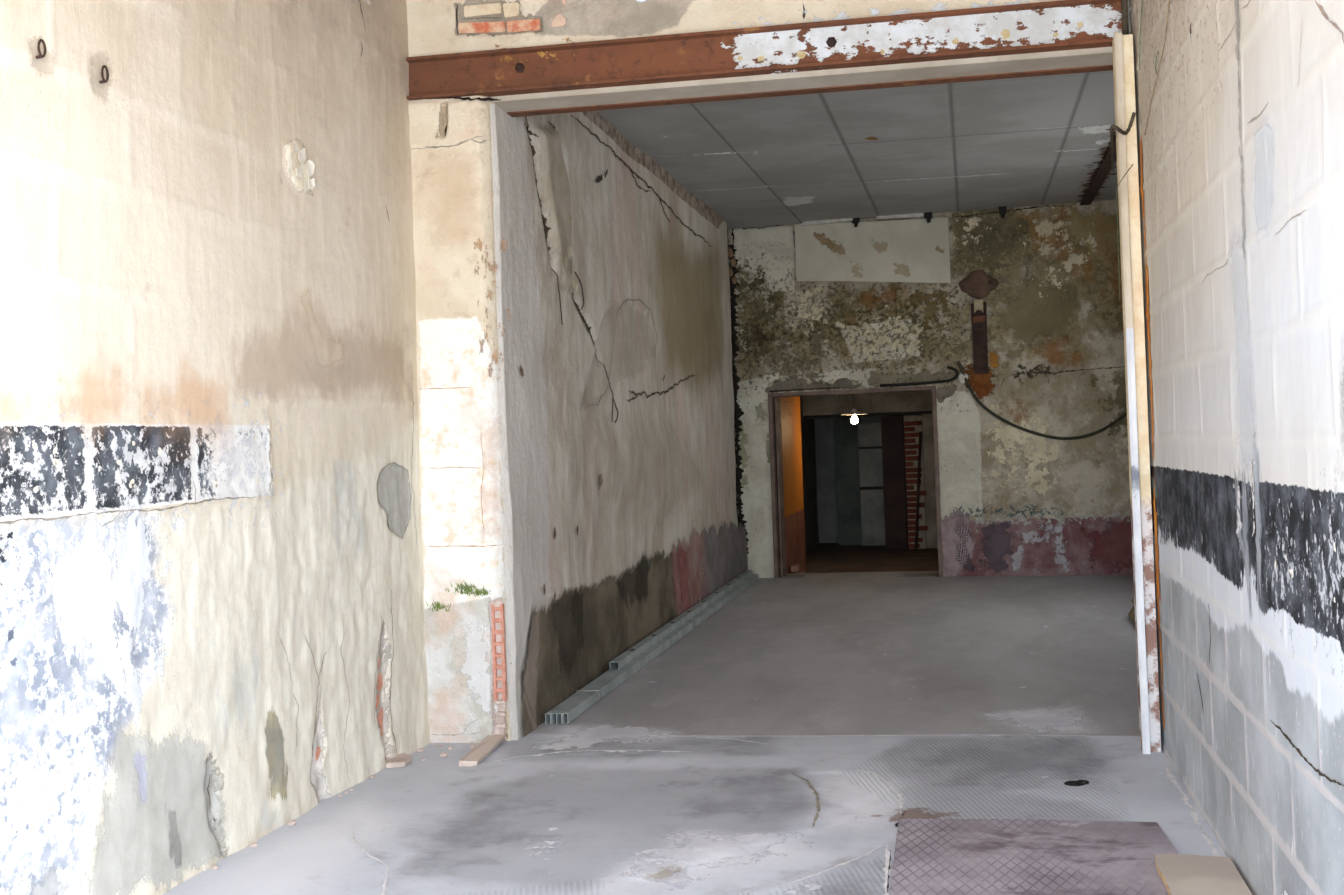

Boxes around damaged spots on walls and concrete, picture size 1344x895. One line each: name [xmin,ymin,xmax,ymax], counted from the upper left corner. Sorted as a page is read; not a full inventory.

spalling [454,0,567,37]
corrosion [496,38,575,69]
peeling [721,0,1131,77]
crack [951,205,1067,218]
crack [411,97,796,554]
corrosion [963,351,999,400]
peeling [0,389,283,726]
leakage [937,511,1014,577]
leakage [1080,520,1133,578]
peeling [1266,468,1344,675]
leakage [522,521,748,737]
crack [1270,720,1344,786]